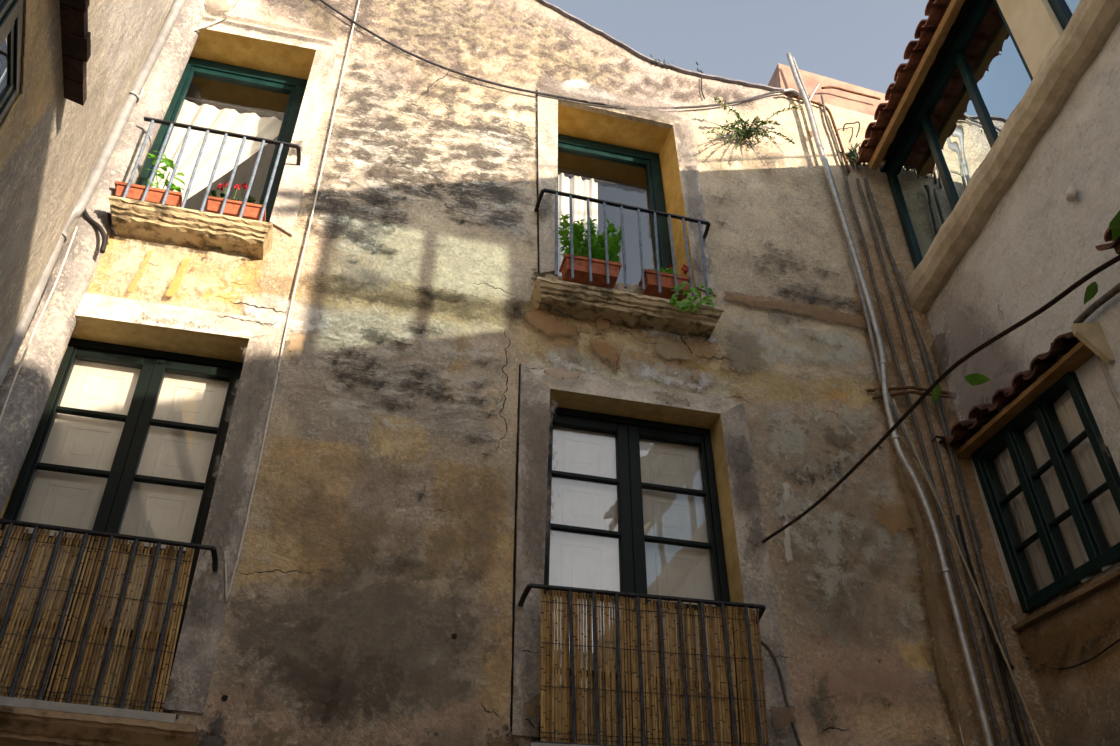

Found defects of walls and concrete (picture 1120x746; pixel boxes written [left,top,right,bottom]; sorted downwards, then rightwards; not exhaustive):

damp [207,11,339,41]
damp [560,79,611,94]
damp [304,50,537,307]
damp [328,322,454,412]
peeling [524,308,744,402]
damp [189,342,278,620]
crack [236,568,329,576]
crack [480,329,543,733]
peeling [758,407,922,615]
damp [232,596,432,738]